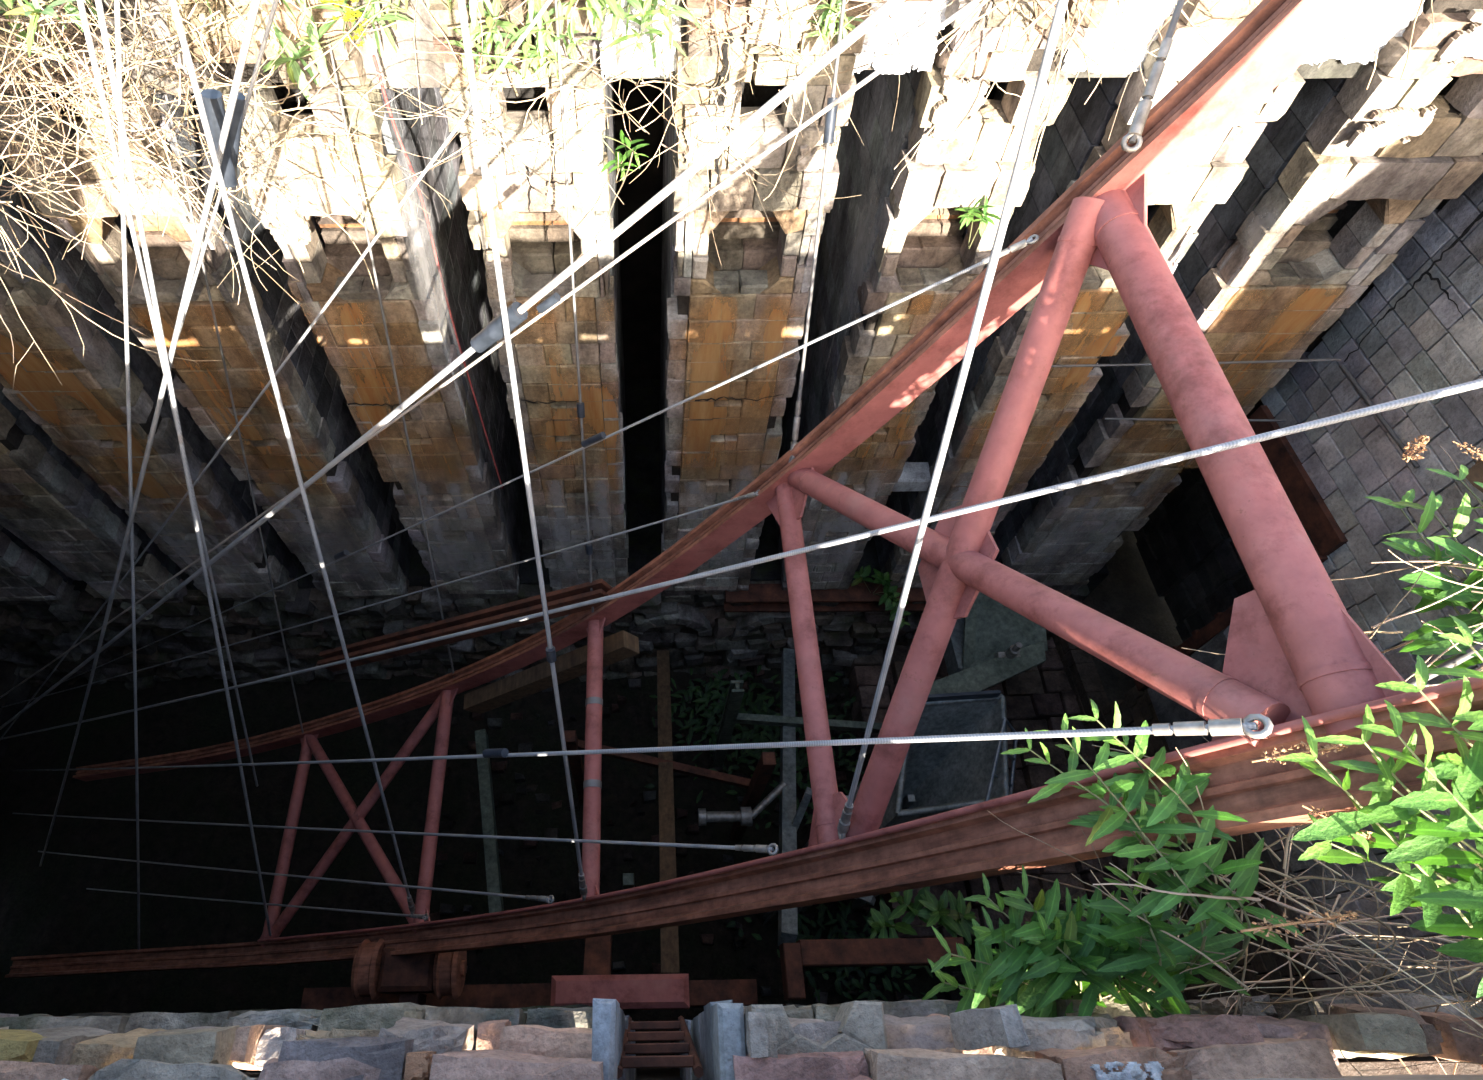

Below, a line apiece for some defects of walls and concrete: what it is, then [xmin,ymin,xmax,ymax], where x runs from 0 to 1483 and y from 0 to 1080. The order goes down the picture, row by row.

flaking render [1060,0,1178,74]
flaking render [1303,0,1425,66]
spalling [1436,9,1483,64]
spalling [1346,105,1438,148]